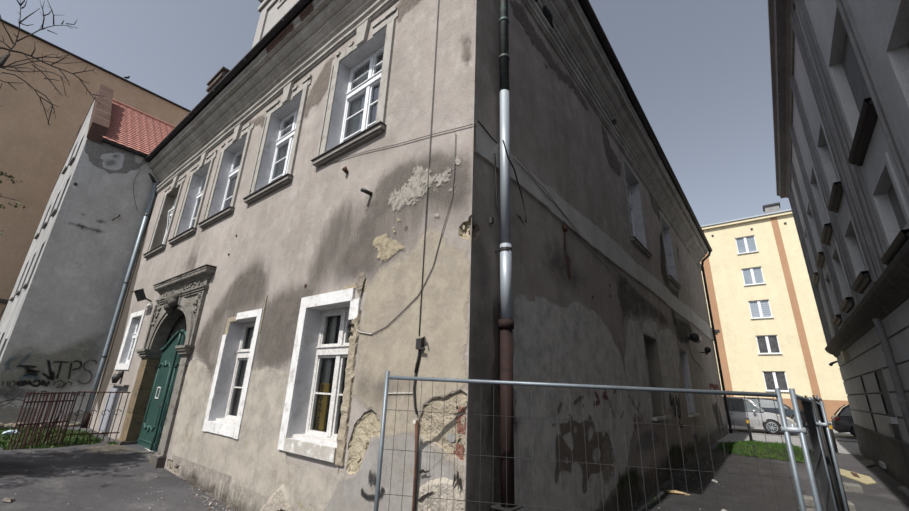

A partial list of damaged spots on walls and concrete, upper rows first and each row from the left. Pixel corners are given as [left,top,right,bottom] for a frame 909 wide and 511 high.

water stain [511,1,588,110]
flaking render [85,138,146,174]
water stain [315,157,466,278]
peeling [373,157,464,261]
flaking render [458,214,480,242]
water stain [198,266,310,374]
flaking render [346,410,381,475]
flaking render [418,390,467,461]
flaking render [552,396,615,493]